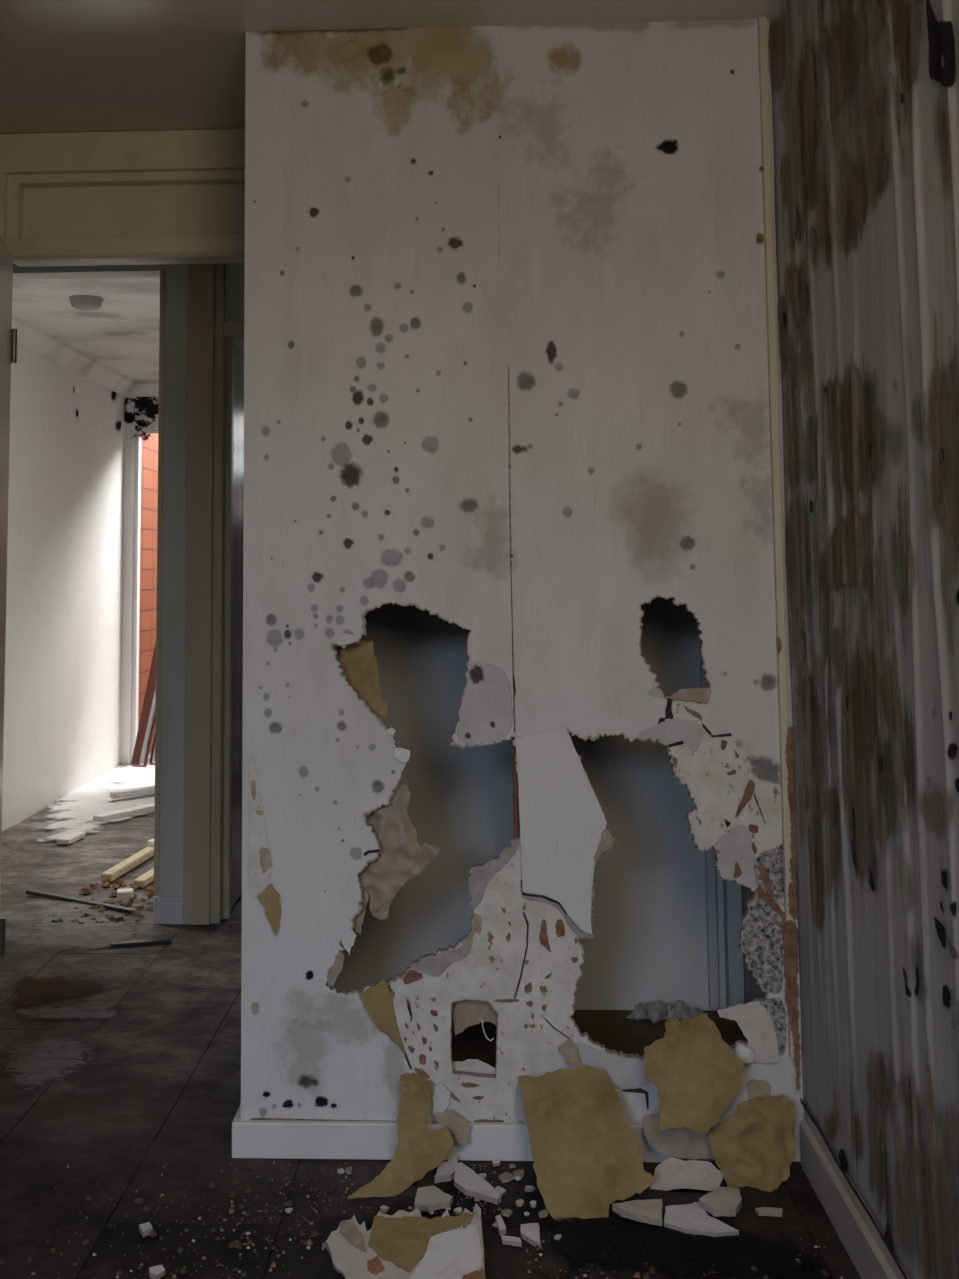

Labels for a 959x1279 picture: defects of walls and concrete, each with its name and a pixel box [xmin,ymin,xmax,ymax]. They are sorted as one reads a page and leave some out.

water stain [262,26,498,129]
water stain [657,140,678,154]
water stain [546,341,556,363]
water stain [346,376,388,445]
mould [341,464,361,487]
water stain [768,0,959,931]
peeling [594,828,614,865]
peeling [636,701,799,1057]
mould [934,869,958,959]
peeling [359,844,649,1122]
spalling [478,1159,548,1218]
water stain [824,1052,959,1279]